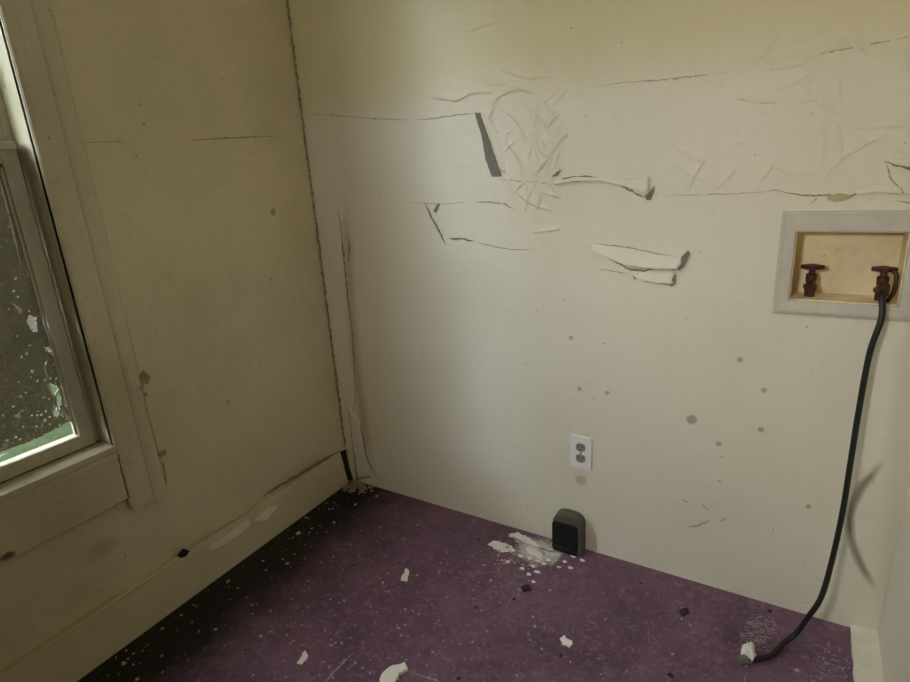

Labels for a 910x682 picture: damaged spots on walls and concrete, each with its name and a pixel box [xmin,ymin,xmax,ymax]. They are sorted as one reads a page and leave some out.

peeling [483,114,506,173]
peeling [552,170,654,200]
peeling [588,243,690,287]